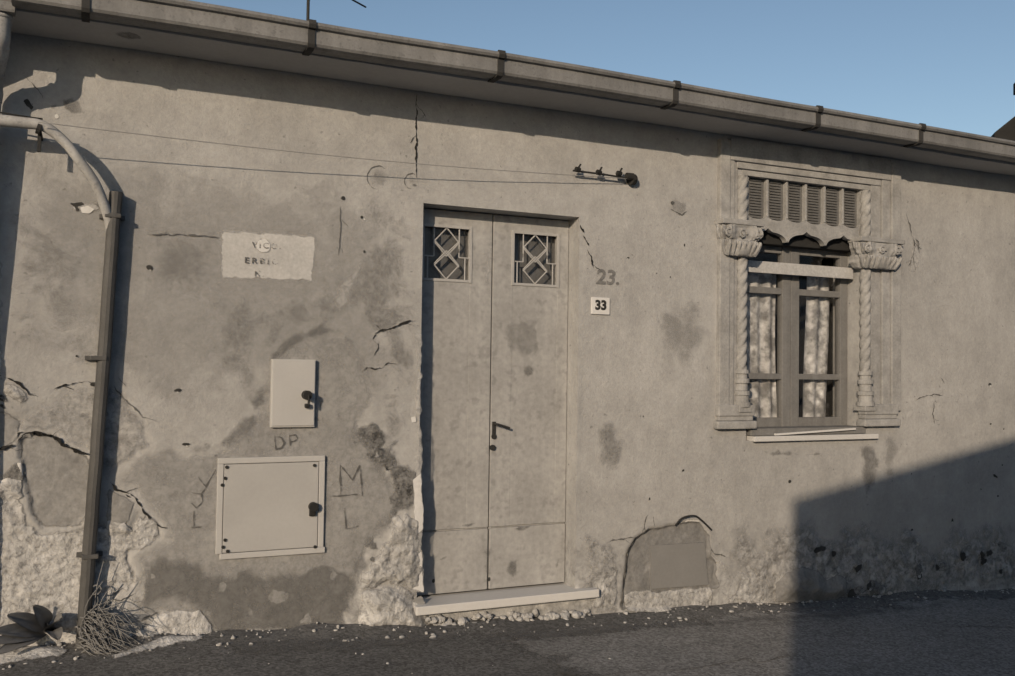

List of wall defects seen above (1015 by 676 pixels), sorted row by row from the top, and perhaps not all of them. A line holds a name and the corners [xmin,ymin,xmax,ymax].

crack [410,96,425,177]
crack [0,428,88,455]
crack [0,375,91,396]
flaking render [103,393,145,474]
crack [115,379,155,421]
flaking render [353,335,424,592]
crack [362,320,418,372]
crack [112,484,166,529]
flaking render [0,463,84,647]
flaking render [92,517,160,610]
spalling [729,518,1015,604]
flaking render [135,610,212,636]